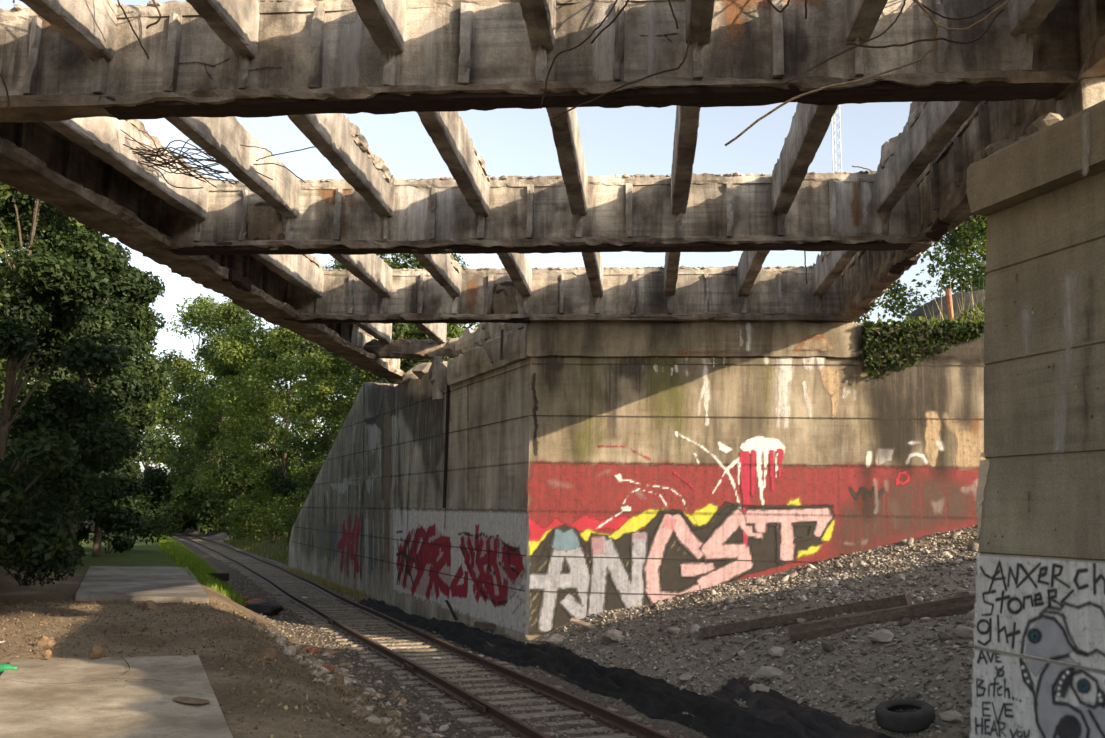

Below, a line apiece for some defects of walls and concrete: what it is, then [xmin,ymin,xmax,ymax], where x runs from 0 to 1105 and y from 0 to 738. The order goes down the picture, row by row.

spalling [120,129,240,189]
water stain [607,356,688,437]
water stain [699,357,730,425]
water stain [765,357,825,427]
water stain [843,326,984,551]